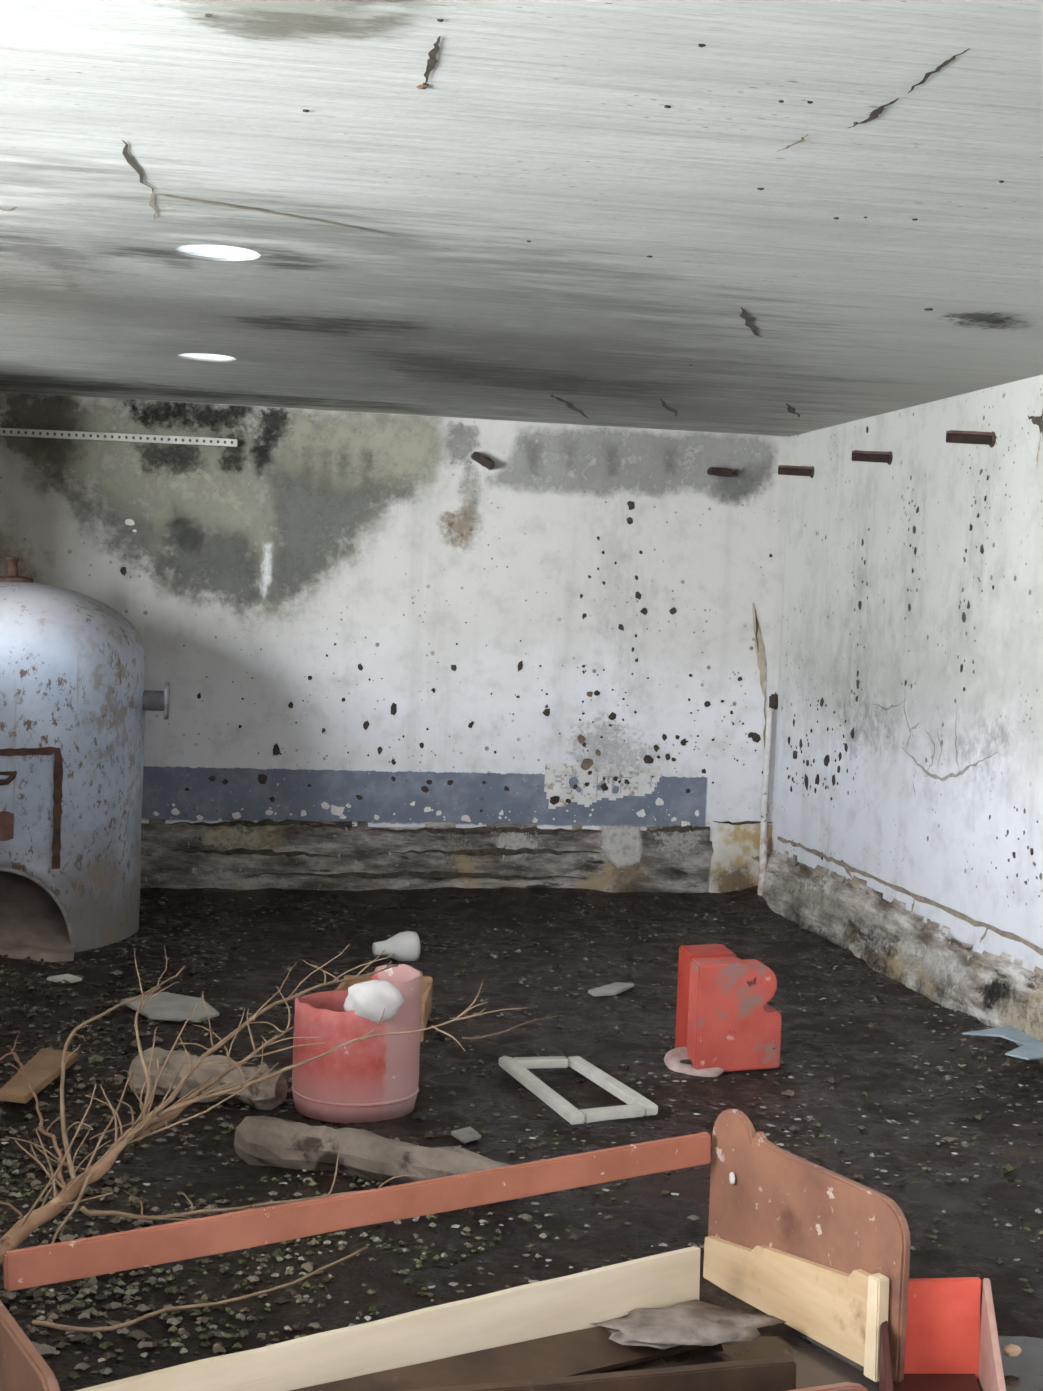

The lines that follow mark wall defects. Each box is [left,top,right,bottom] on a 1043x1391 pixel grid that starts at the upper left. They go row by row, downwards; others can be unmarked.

water stain [188,0,415,39]
water stain [114,247,191,266]
water stain [238,317,421,333]
peeling [904,500,920,652]
spalling [140,665,1043,1046]